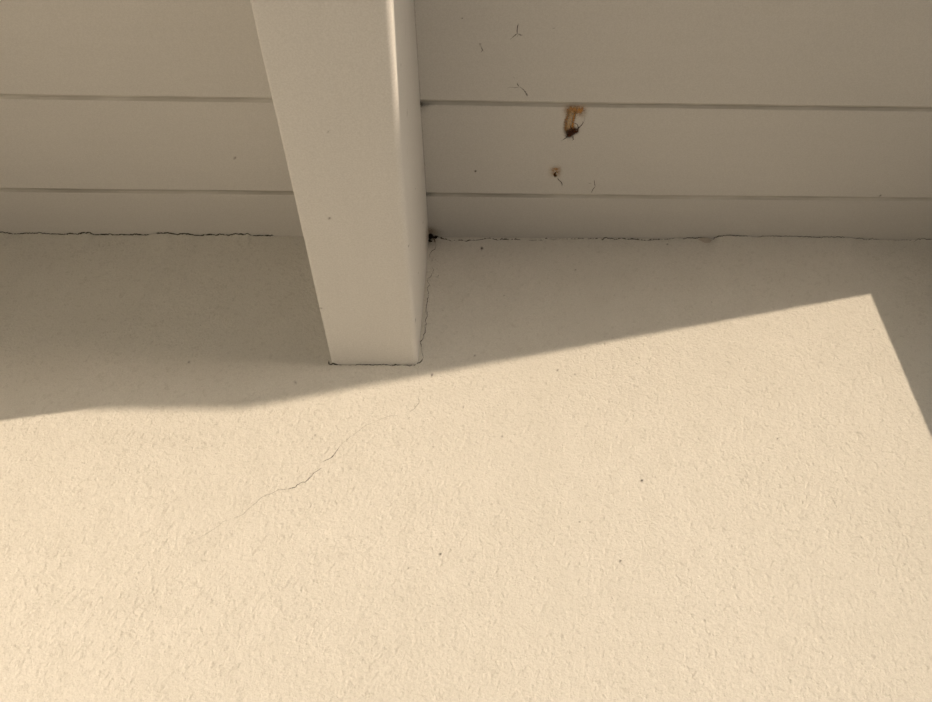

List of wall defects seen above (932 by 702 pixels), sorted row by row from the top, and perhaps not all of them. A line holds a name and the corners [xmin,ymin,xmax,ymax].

rust [563,106,584,140]
crack [0,229,273,237]
crack [328,235,739,366]